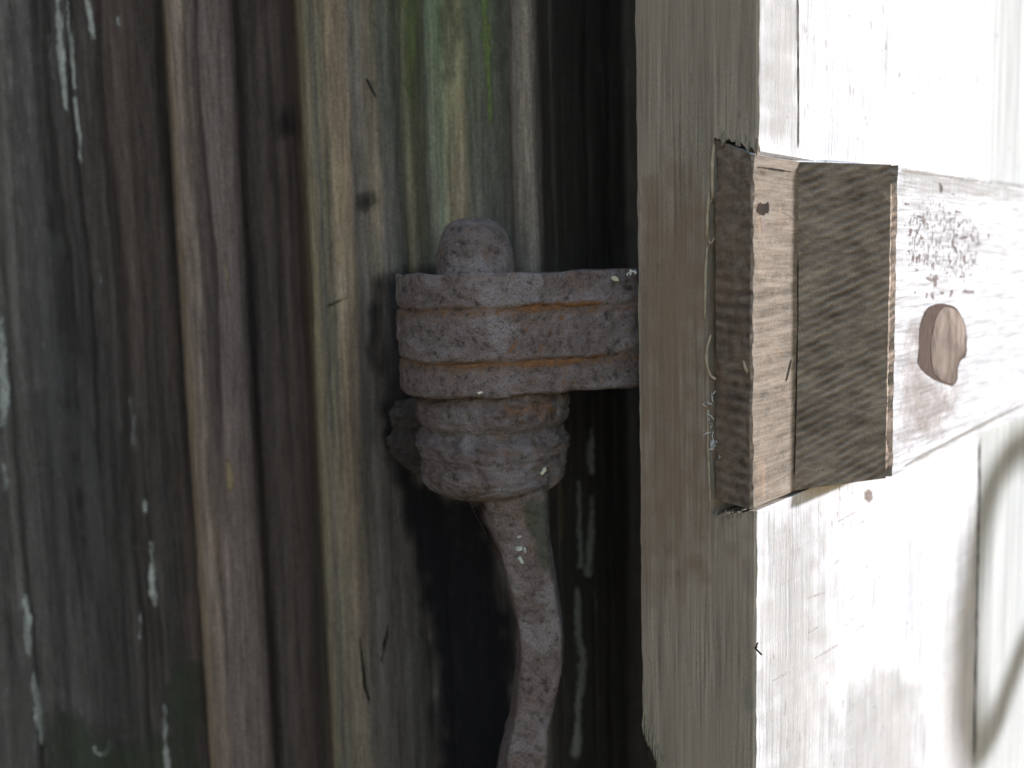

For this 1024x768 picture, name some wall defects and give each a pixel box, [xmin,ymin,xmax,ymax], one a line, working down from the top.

peeling [905,193,990,300]
corrosion [500,301,602,319]